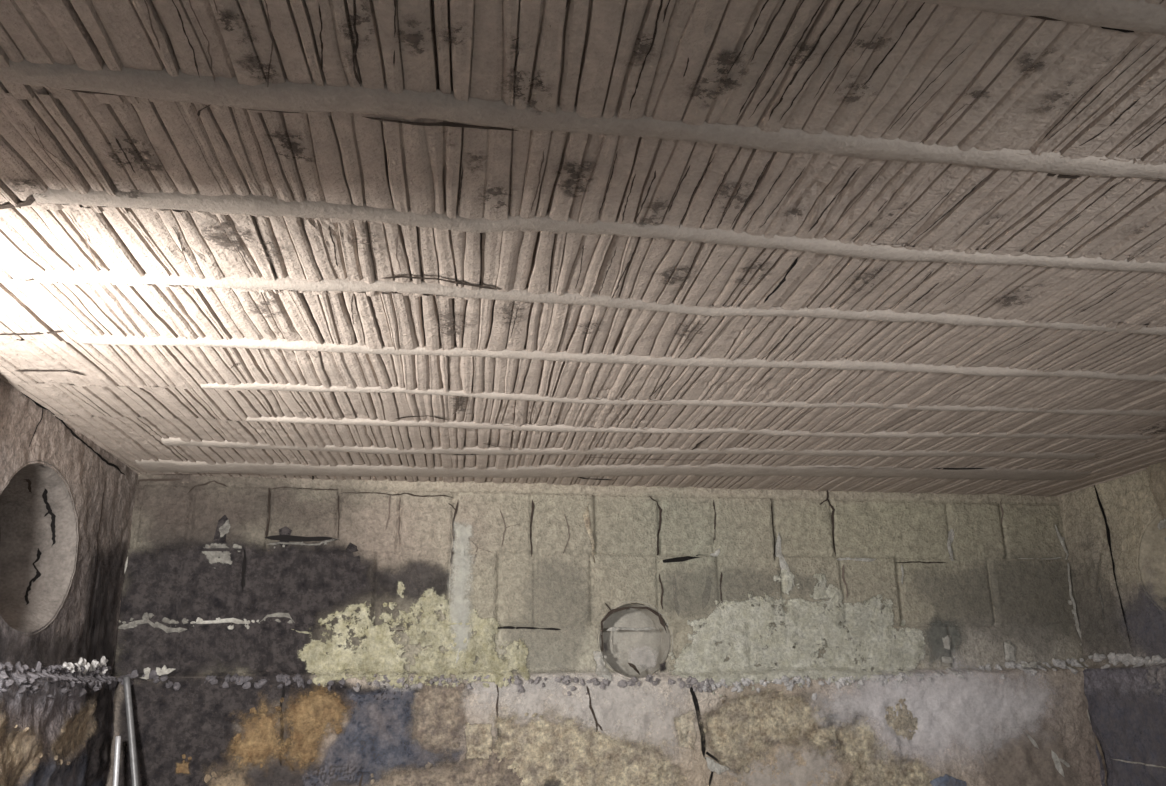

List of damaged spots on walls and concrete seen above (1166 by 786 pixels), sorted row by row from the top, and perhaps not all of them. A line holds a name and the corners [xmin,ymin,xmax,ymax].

crack [1029,173,1166,253]
crack [0,329,64,337]
crack [18,370,234,556]
crack [23,479,56,605]
crack [601,496,723,651]
crack [587,686,603,732]
crack [690,687,730,786]